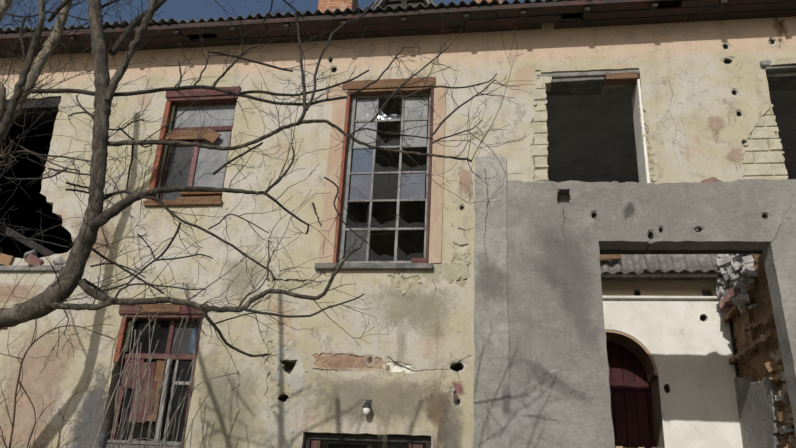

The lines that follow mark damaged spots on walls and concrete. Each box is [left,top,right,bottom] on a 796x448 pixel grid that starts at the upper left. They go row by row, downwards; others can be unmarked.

peeling [387,241,471,301]
leakage [72,370,108,448]
peeling [264,339,318,448]
spalling [382,358,420,377]
crack [387,280,473,384]